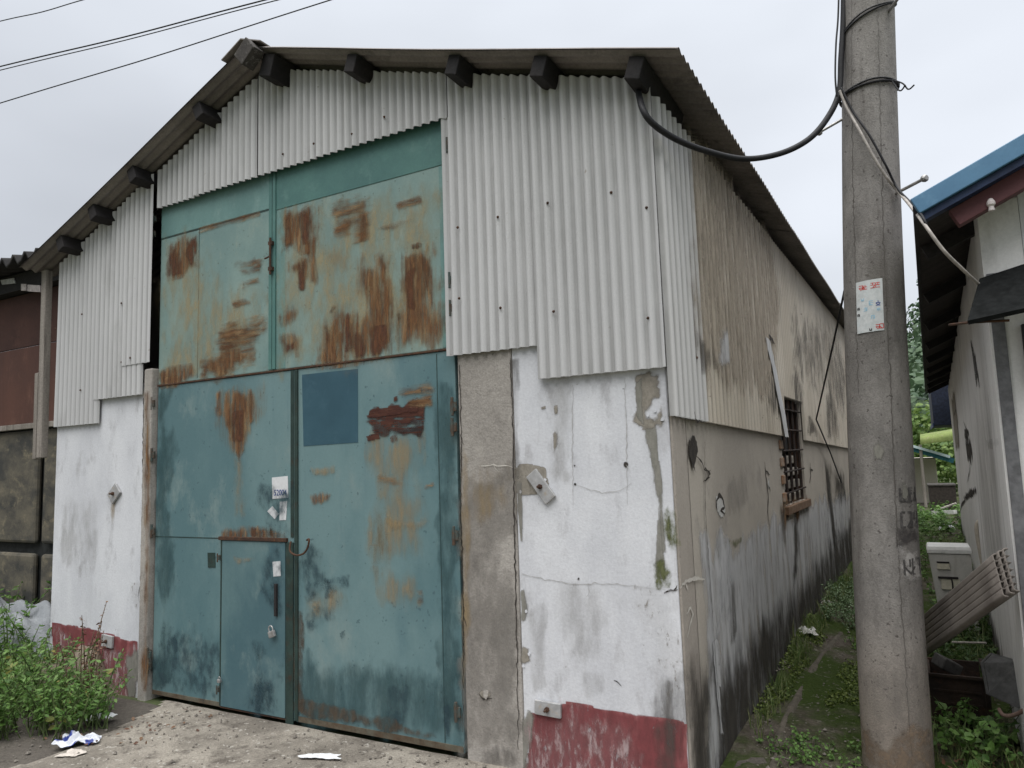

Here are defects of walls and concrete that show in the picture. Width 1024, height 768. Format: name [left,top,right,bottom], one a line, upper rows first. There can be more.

corrosion [159,213,265,387]
corrosion [284,197,446,368]
water stain [693,147,779,409]
corrosion [217,390,256,457]
crack [459,359,719,750]
peeling [623,371,665,579]
spalling [689,435,710,481]
water stain [692,466,852,768]